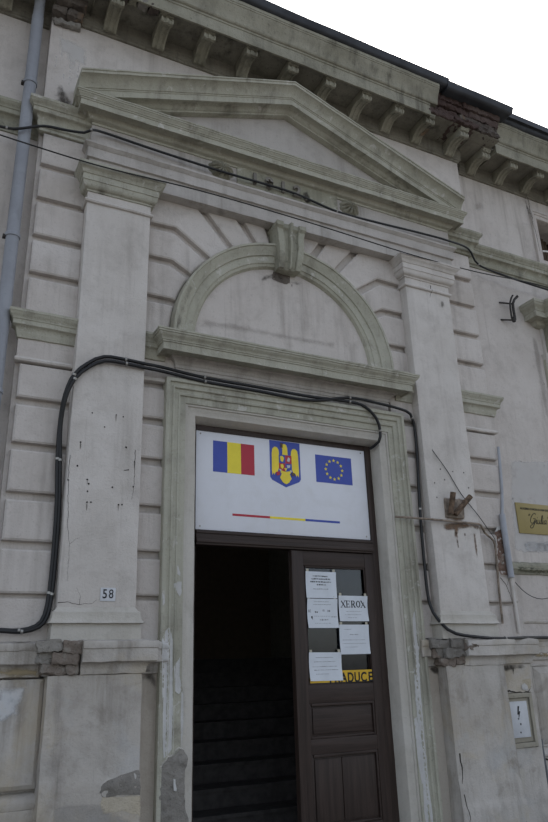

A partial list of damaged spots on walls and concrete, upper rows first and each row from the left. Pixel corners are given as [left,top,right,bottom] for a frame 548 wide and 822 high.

spalling [50,0,88,33]
spalling [121,0,170,18]
spalling [429,93,500,146]
rust [445,518,478,553]
spalling [35,639,83,677]
flaking render [159,627,189,822]
spalling [413,612,479,822]
flaking render [97,770,141,816]
crack [459,753,471,820]